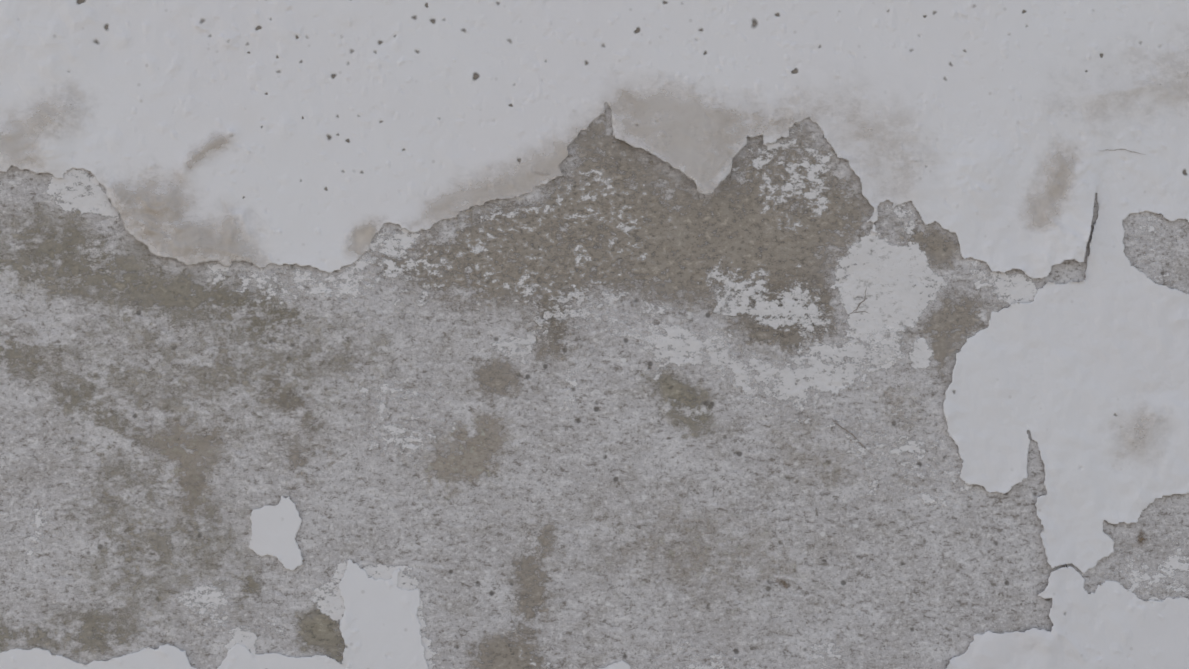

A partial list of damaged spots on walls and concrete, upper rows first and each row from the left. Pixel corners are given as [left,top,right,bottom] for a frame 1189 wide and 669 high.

leakage [0,211,297,335]
peeling [466,227,495,254]
peeling [565,207,617,246]
peeling [577,167,616,202]
leakage [385,92,869,355]
peeling [616,201,639,235]
peeling [1122,211,1189,294]
leakage [921,297,983,367]
leakage [653,369,708,436]
peeling [1077,493,1189,601]
leakage [469,525,555,669]
leakage [298,607,345,661]